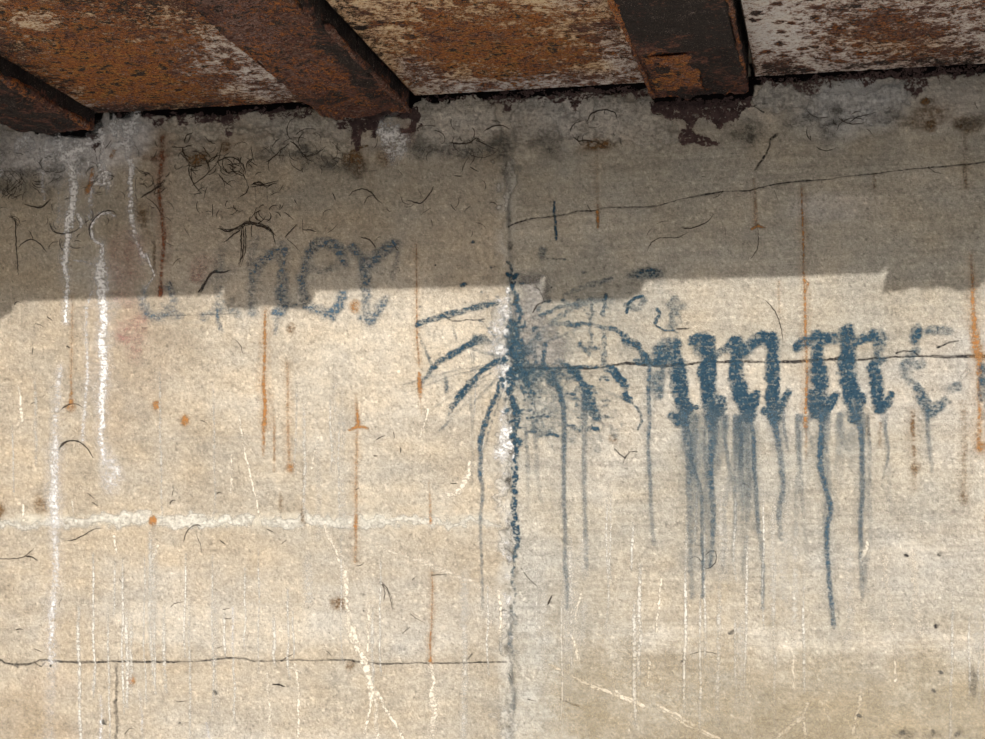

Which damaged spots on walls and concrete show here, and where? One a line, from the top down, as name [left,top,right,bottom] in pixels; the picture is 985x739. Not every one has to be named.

corrosion [114,102,316,296]
efflorescence [376,122,410,159]
corrosion [334,85,753,175]
crack [508,133,985,227]
corrosion [752,63,985,132]
water stain [0,111,155,484]
crack [513,328,985,371]
corrosion [801,189,809,428]
corrosion [970,255,985,451]
efflorescence [48,367,62,663]
crack [0,654,505,728]